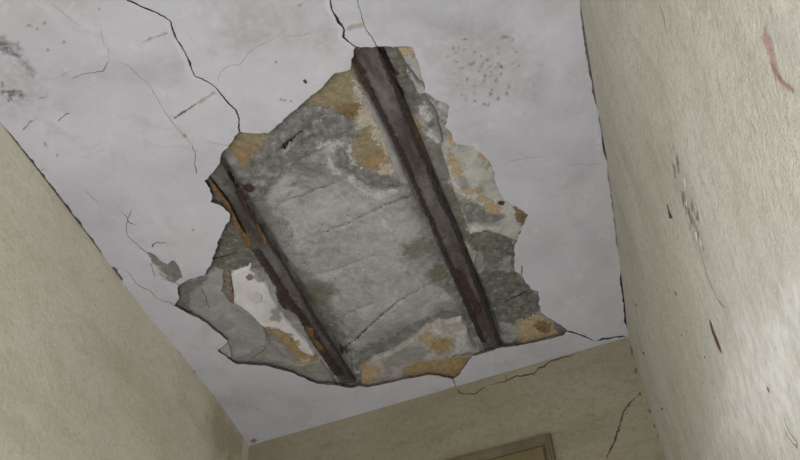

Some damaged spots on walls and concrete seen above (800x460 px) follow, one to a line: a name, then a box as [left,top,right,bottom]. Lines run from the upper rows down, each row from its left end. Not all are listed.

crack [61,0,311,174]
crack [324,0,377,48]
crack [580,4,598,110]
spalling [147,60,485,387]
spalling [378,46,566,346]
crack [453,163,627,395]
crack [606,397,637,460]